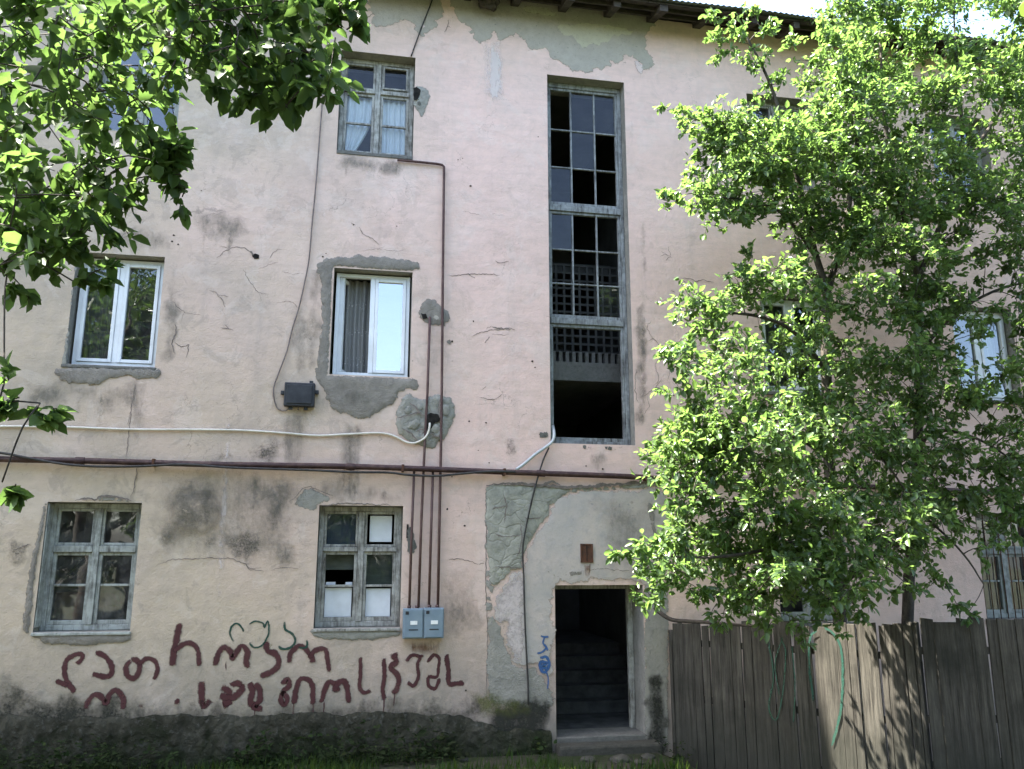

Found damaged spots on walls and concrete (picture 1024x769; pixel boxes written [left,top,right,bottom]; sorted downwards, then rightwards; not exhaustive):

peeling [367,0,655,74]
crack [171,304,199,357]
crack [160,557,289,571]
peeling [485,481,671,752]
damp [645,676,668,754]